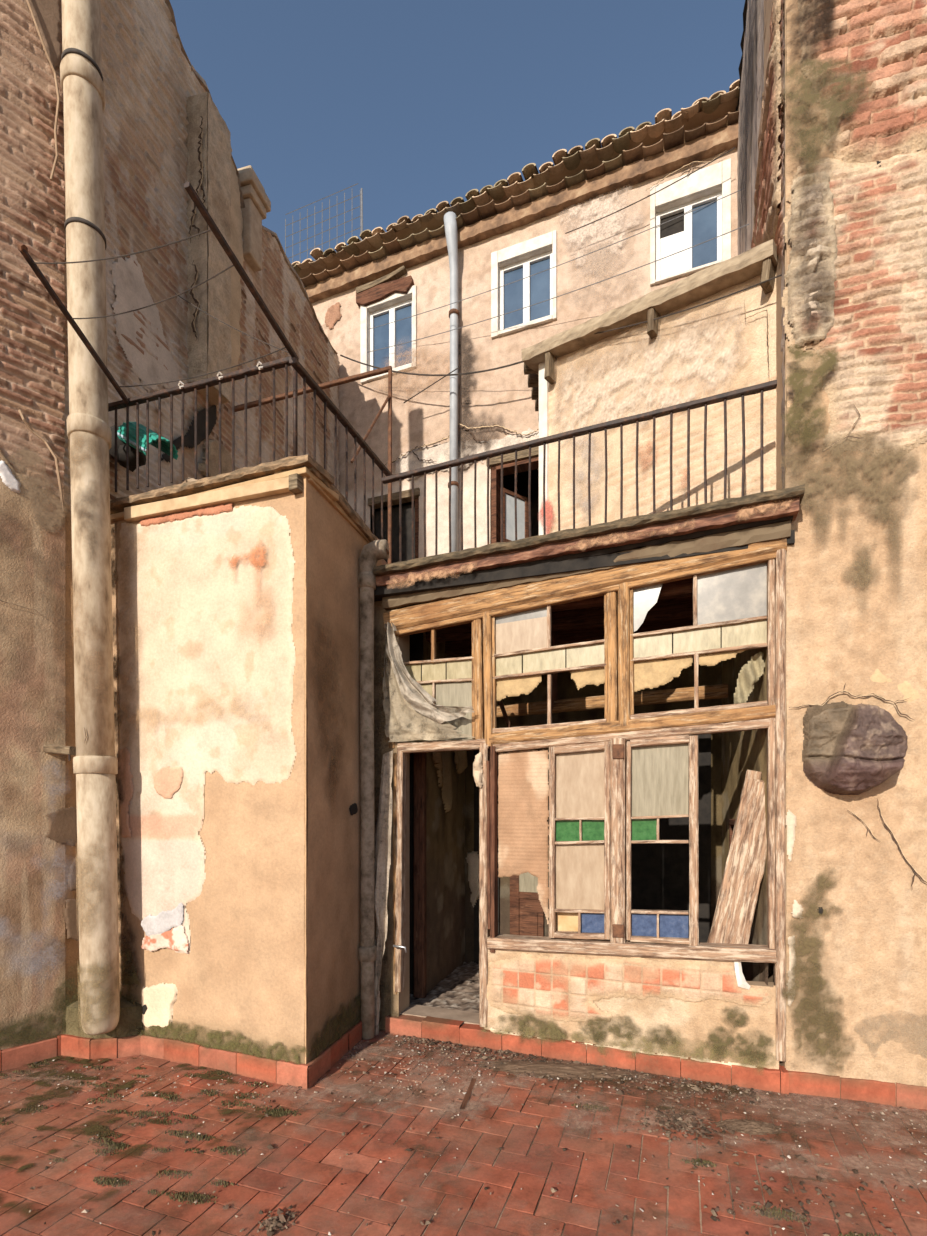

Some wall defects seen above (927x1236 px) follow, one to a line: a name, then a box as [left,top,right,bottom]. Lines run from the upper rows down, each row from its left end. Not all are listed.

crack [189,116,205,340]
flaking render [753,0,927,457]
peeling [0,460,21,493]
peeling [117,503,297,954]
crack [848,799,927,890]
water stain [77,965,131,1029]
spalling [141,982,178,1028]